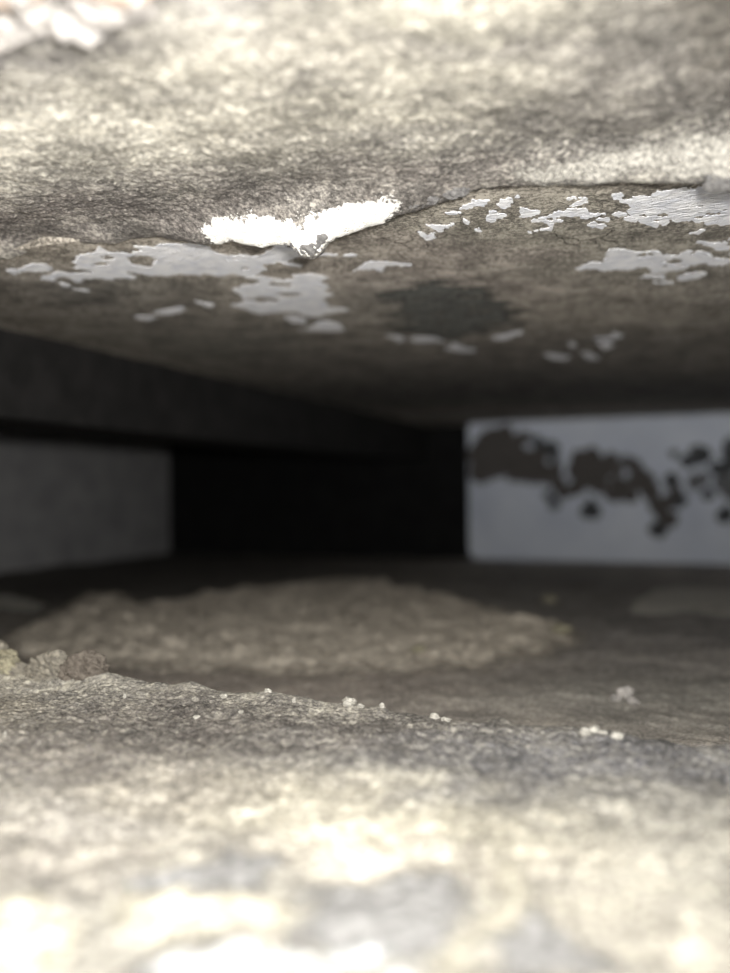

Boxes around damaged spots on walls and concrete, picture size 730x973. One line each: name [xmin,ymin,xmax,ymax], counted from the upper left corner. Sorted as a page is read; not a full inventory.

peeling [6,190,412,332]
leakage [375,280,521,340]
peeling [418,131,730,284]